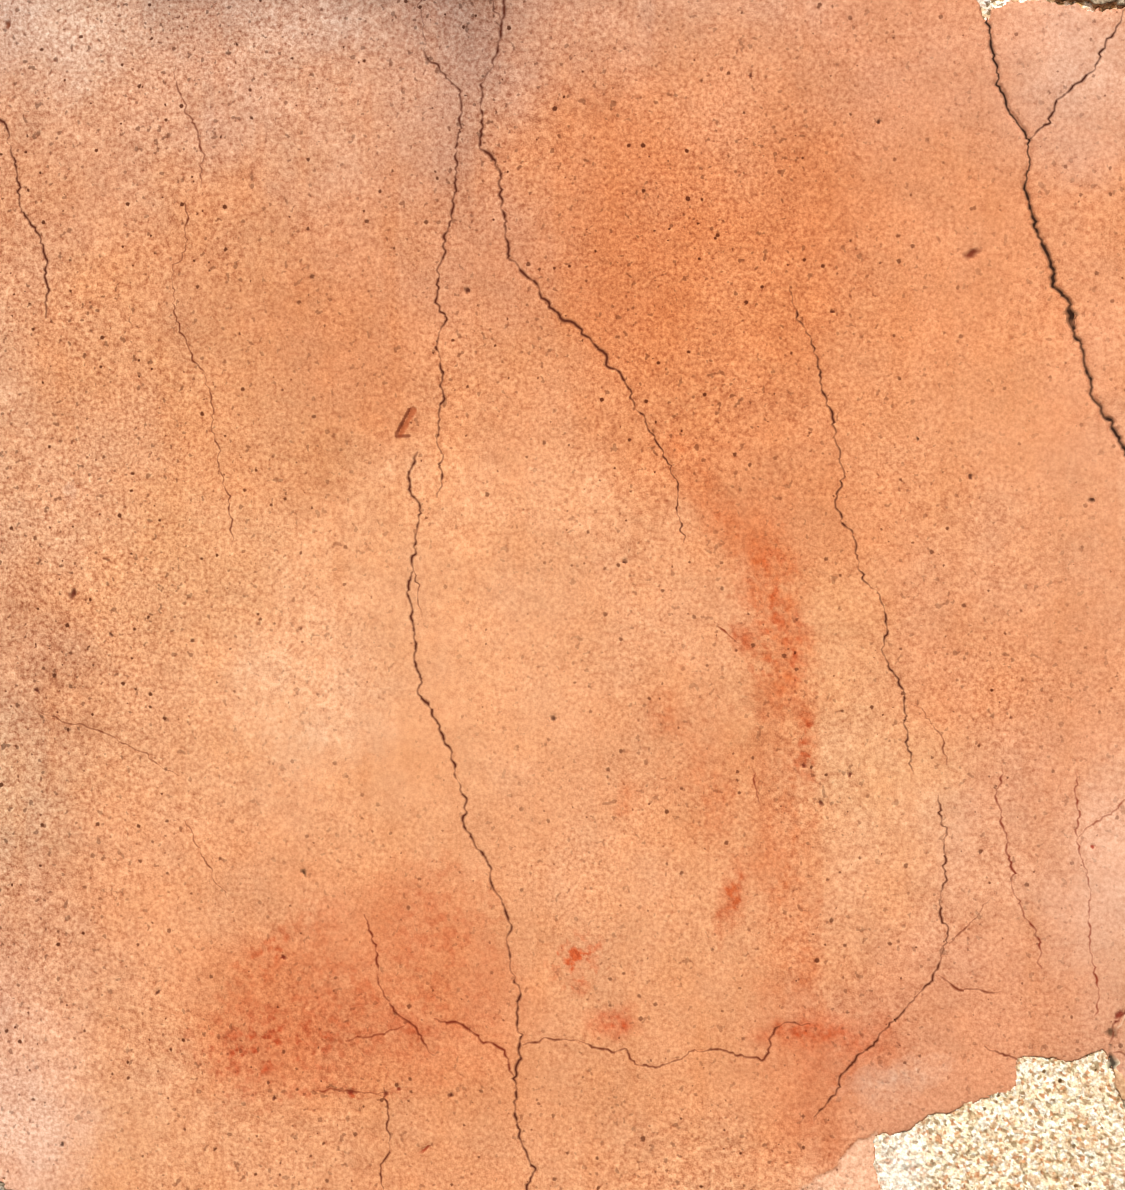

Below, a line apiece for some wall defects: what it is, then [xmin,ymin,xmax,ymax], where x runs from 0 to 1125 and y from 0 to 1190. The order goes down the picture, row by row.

spalling [977,0,1125,20]
crack [0,117,51,319]
crack [983,8,1125,458]
crack [345,0,810,1190]
crack [789,284,948,774]
crack [812,765,1043,1124]
spalling [797,1008,1125,1190]
crack [1073,768,1125,1136]